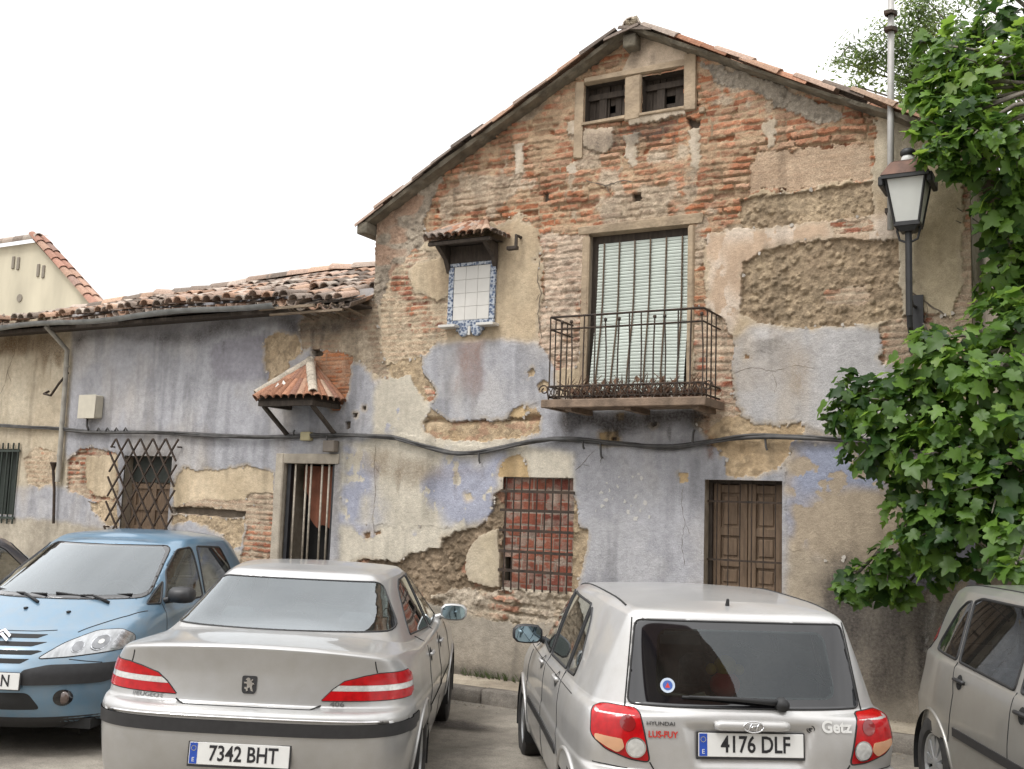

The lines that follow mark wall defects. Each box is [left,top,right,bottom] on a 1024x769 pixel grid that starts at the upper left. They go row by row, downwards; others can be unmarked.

flaking render [262,44,916,625]
flaking render [924,185,972,358]
flaking render [23,445,119,527]
flaking render [171,465,275,564]